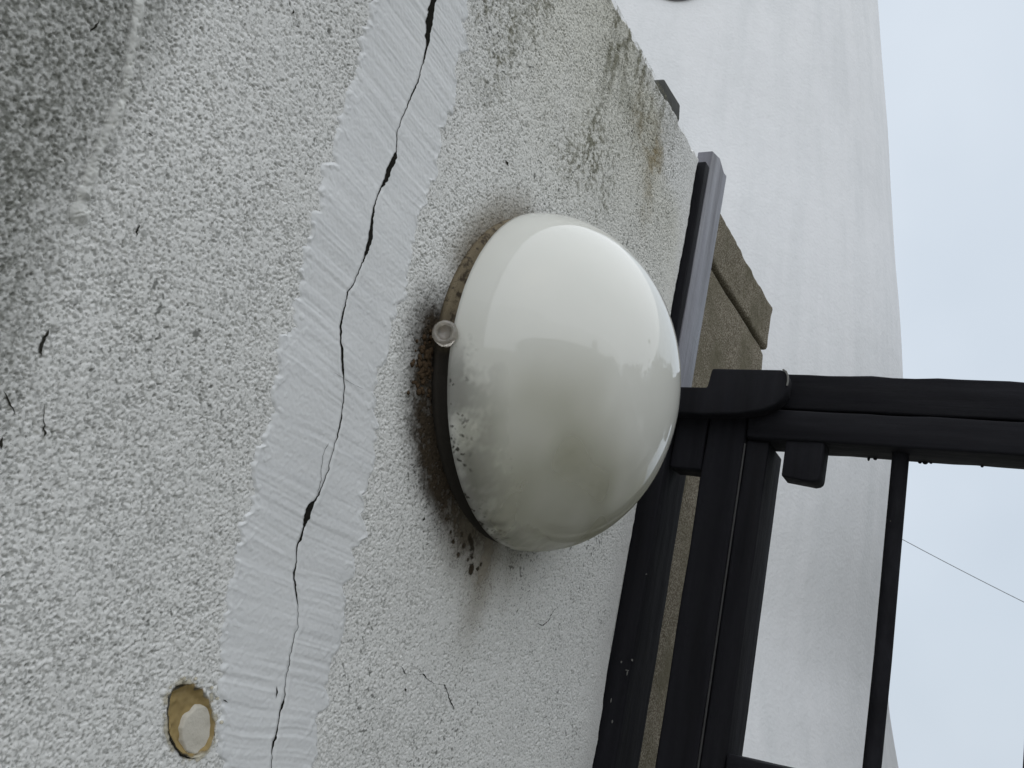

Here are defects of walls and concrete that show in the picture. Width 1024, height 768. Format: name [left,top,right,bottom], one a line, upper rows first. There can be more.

crack [271,0,437,768]